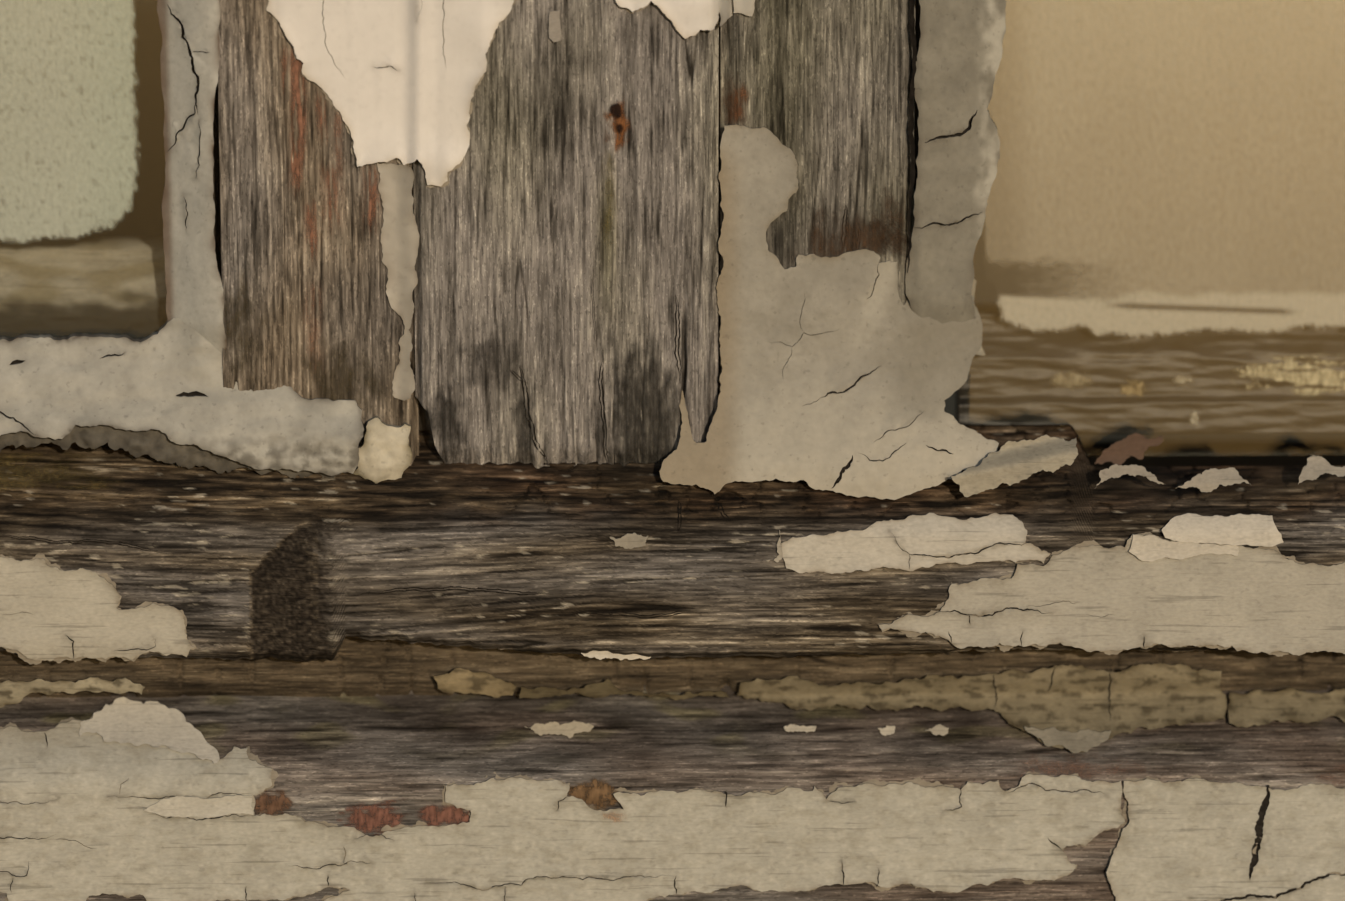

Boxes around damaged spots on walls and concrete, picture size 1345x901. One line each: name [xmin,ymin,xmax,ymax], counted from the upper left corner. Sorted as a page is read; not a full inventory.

crack [167,4,207,228]
peeling [265,0,516,401]
corrosion [606,103,629,150]
peeling [659,124,1078,500]
crack [870,0,977,297]
crack [832,415,952,488]
corrosion [340,801,402,835]
corrosion [420,805,471,826]
corrosion [568,779,618,820]
peeling [0,553,1345,901]
peeling [434,512,1345,753]
crack [1221,785,1345,901]